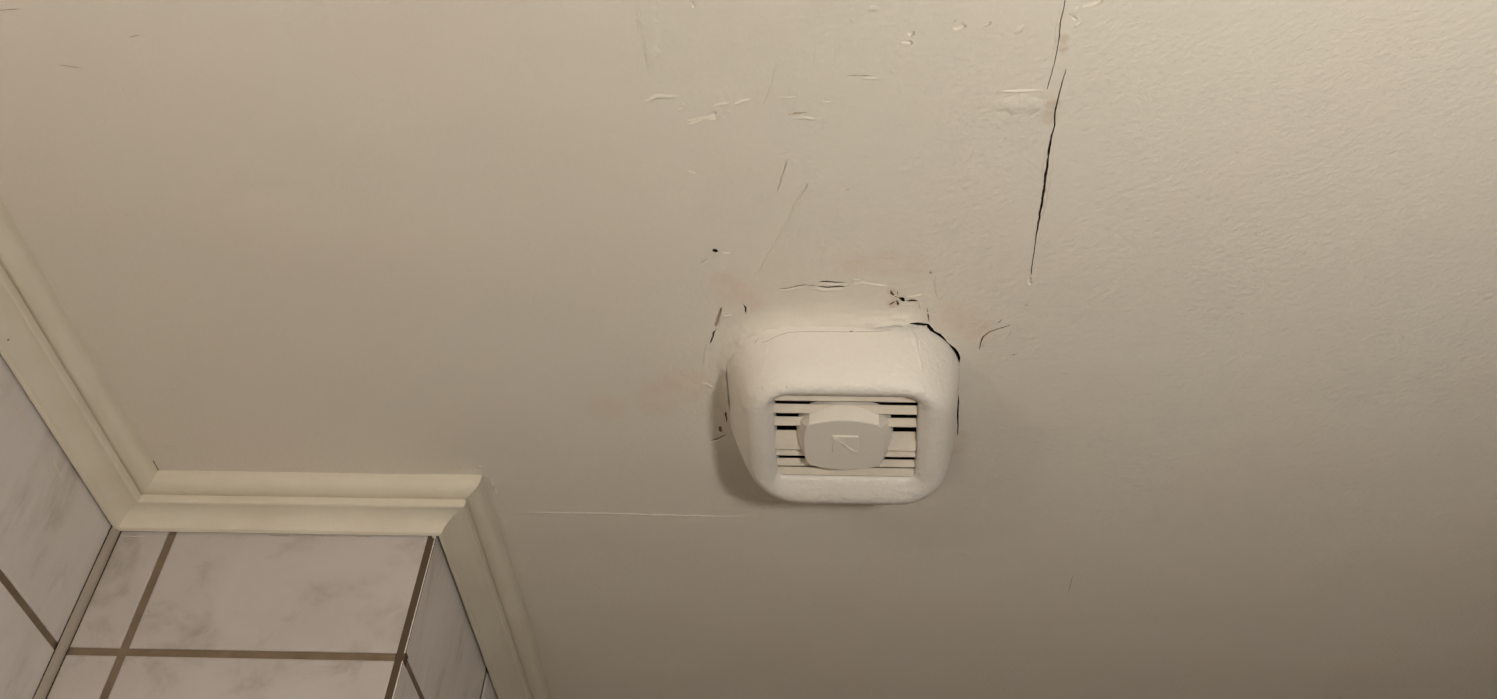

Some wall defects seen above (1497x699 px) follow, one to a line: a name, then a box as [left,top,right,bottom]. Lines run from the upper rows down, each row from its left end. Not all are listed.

crack [1028,0,1066,285]
crack [701,284,1011,434]